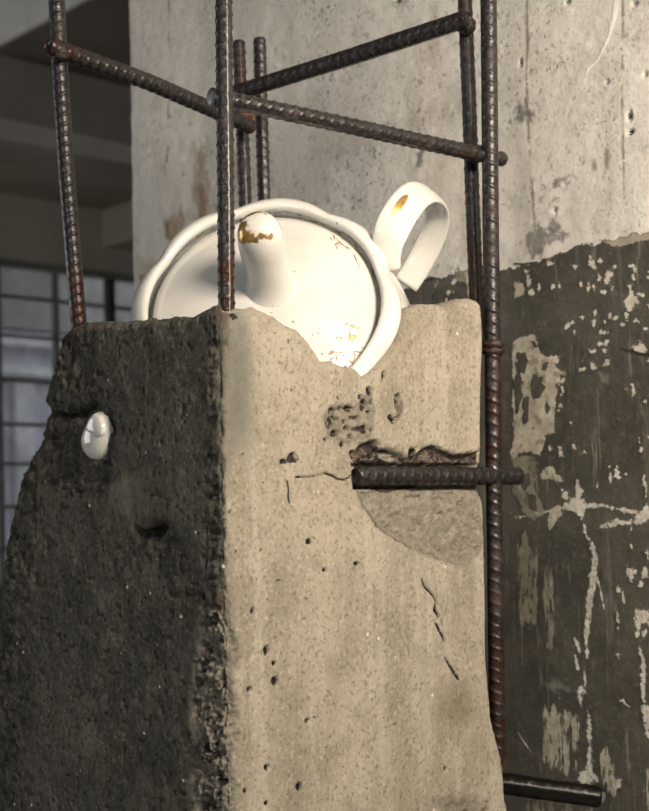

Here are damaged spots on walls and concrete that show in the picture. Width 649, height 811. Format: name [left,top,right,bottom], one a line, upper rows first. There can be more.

peeling [579,255,617,294]
peeling [564,264,649,372]
spalling [349,0,587,776]
crack [287,473,350,504]
peeling [626,550,649,587]
crack [421,579,459,680]
peeling [633,609,649,703]
peeling [600,747,622,797]